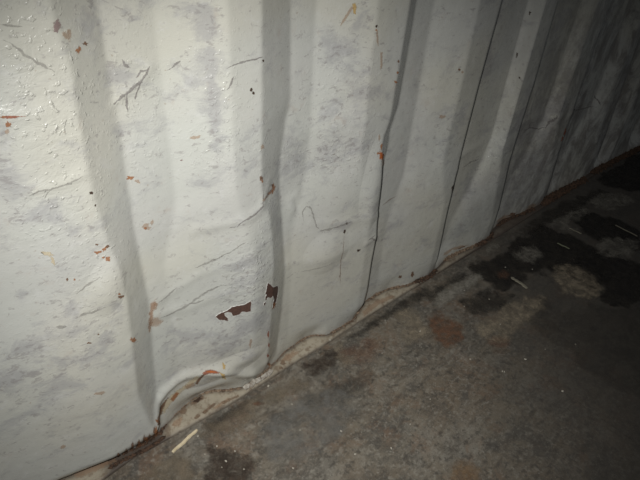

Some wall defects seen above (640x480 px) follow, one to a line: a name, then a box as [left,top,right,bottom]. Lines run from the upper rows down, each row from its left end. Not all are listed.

corrosion [443,146,640,261]
peeling [215,301,252,321]
peeling [263,282,278,308]
corrosion [174,269,438,416]
corrosion [92,363,226,469]